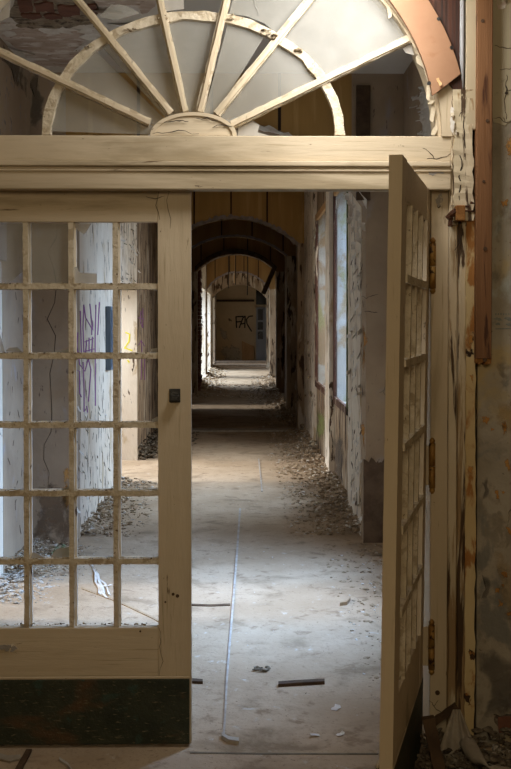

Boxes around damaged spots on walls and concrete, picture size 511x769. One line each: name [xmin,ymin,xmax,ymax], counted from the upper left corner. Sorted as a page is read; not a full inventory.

peeling [0,0,156,70]
peeling [252,121,292,136]
peeling [450,107,459,137]
crack [43,237,57,483]
peeling [344,192,367,421]
flaking render [350,426,384,543]